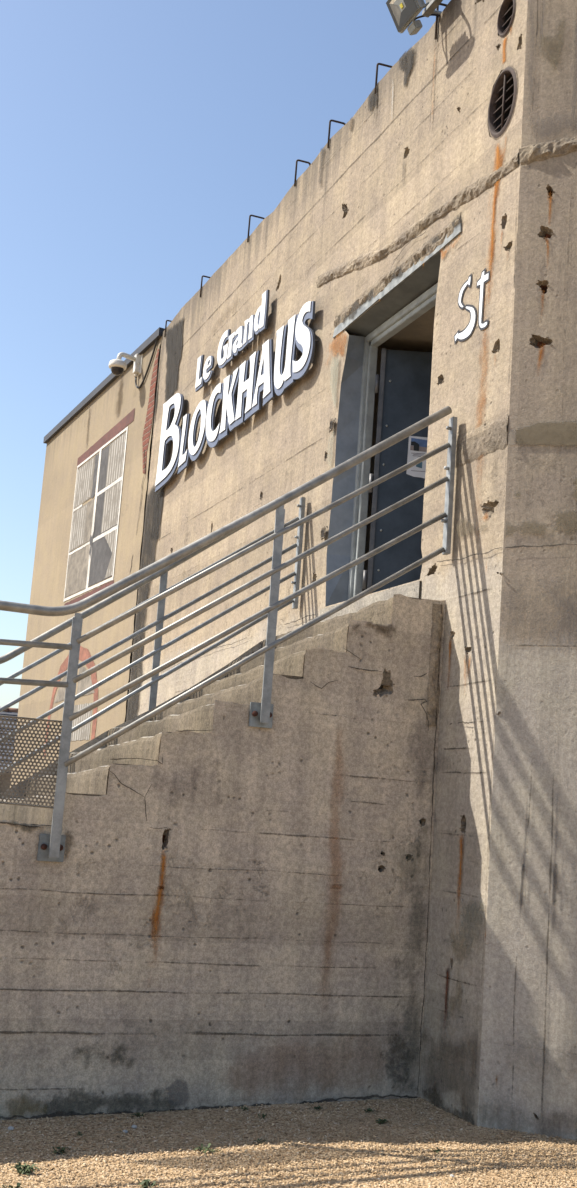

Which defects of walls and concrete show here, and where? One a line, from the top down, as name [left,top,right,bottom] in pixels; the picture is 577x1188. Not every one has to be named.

corrosion [490,146,502,267]
spalling [456,500,499,535]
spalling [373,668,395,697]
corrosion [152,855,165,935]